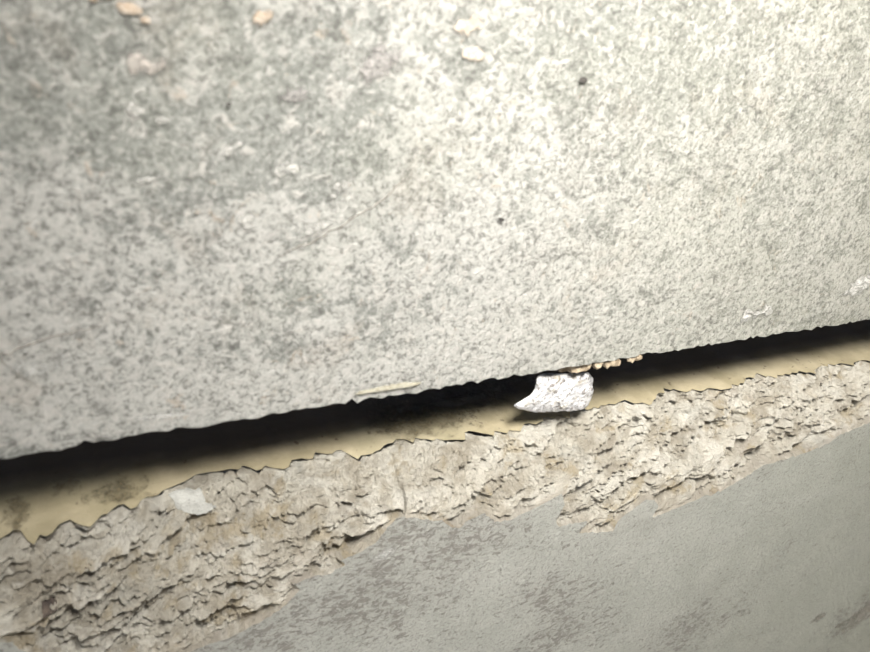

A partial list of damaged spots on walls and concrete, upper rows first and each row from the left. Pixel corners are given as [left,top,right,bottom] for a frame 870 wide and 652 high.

peeling [843,272,870,297]
peeling [741,304,773,322]
spalling [0,361,870,652]